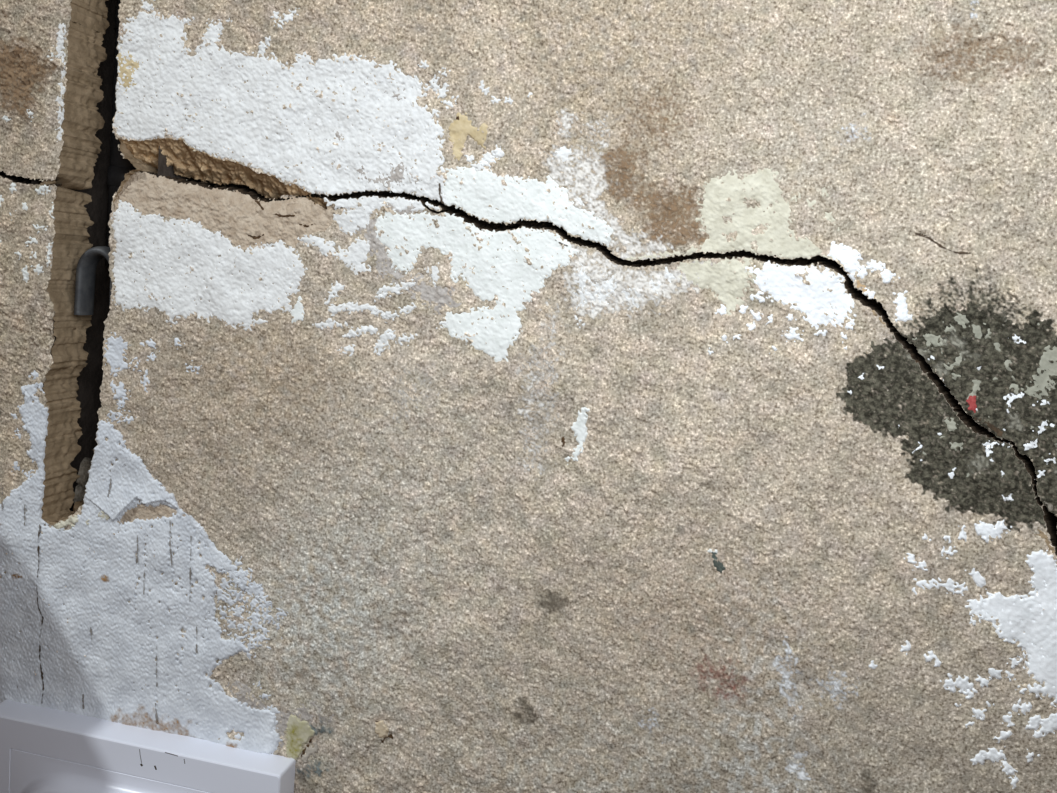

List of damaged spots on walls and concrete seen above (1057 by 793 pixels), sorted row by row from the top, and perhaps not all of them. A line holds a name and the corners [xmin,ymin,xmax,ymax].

crack [0,171,62,187]
peeling [42,0,712,531]
peeling [11,370,45,439]
crack [141,172,1057,555]
damp [836,269,1057,534]
crack [36,531,44,703]
peeling [904,550,987,596]
peeling [922,519,1013,560]
peeling [923,651,1023,728]
peeling [970,698,1057,789]